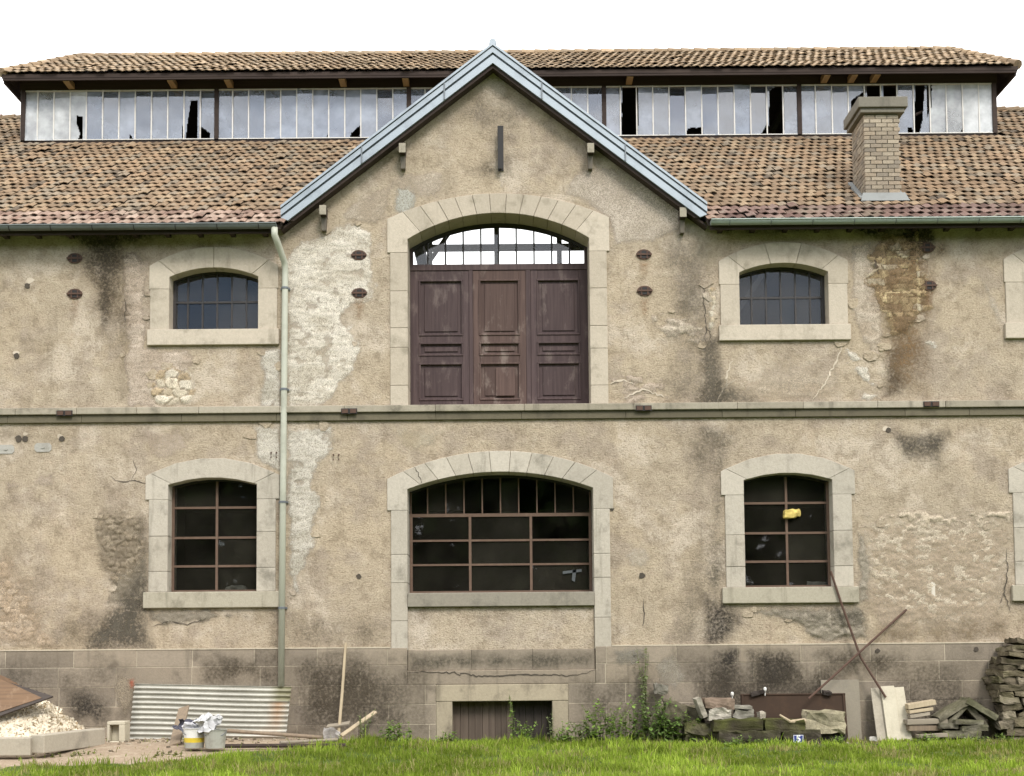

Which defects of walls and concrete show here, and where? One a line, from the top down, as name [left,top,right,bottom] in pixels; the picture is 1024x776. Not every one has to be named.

water stain [75,235,160,320]
peeling [120,253,201,407]
peeling [257,222,377,406]
crack [703,274,712,352]
flaking render [833,231,932,401]
crack [610,379,664,398]
crack [813,351,841,399]
water stain [901,437,942,455]
peeling [243,421,332,596]
water stain [91,576,146,648]
crack [408,669,593,677]